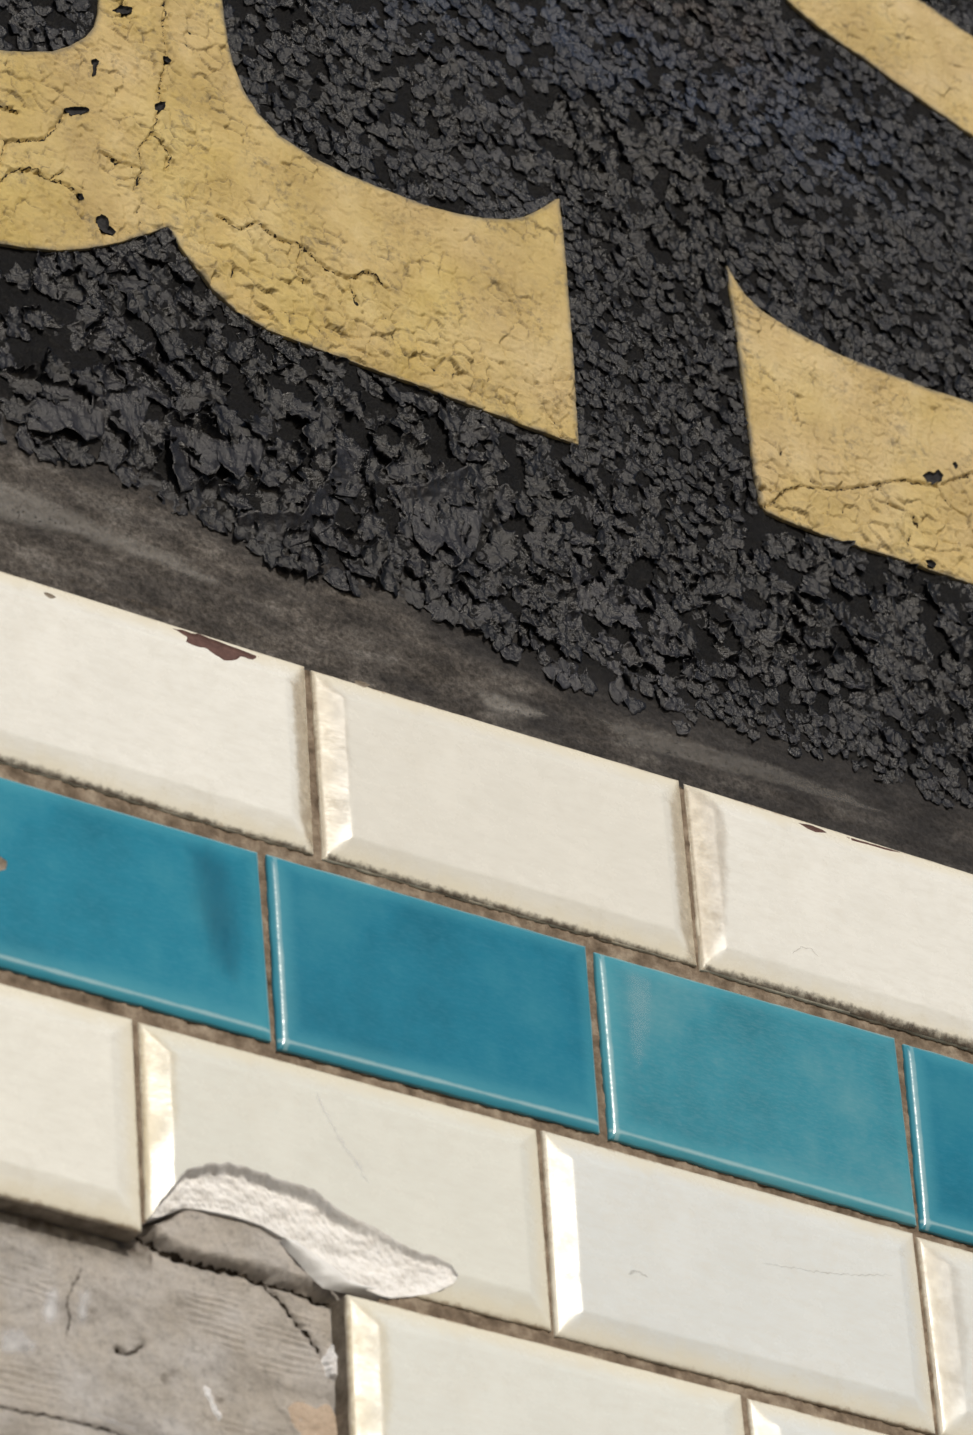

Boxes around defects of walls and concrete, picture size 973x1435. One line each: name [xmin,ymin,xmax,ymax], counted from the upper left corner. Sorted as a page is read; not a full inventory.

crack [105,1,172,187]
peeling [0,0,973,809]
crack [135,1237,329,1354]
spalling [144,1162,458,1302]